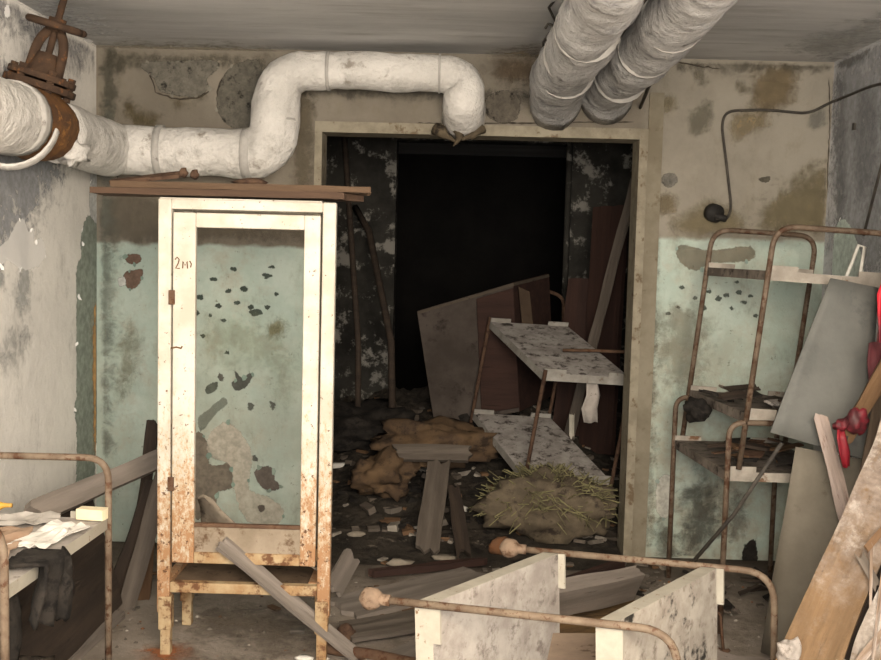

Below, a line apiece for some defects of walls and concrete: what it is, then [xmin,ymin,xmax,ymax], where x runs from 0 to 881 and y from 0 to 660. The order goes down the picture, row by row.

leakage [732,22,881,272]
spalling [662,173,678,188]
leakage [0,154,65,246]
leakage [17,269,30,305]
peeling [118,254,143,291]
peeling [675,245,755,272]